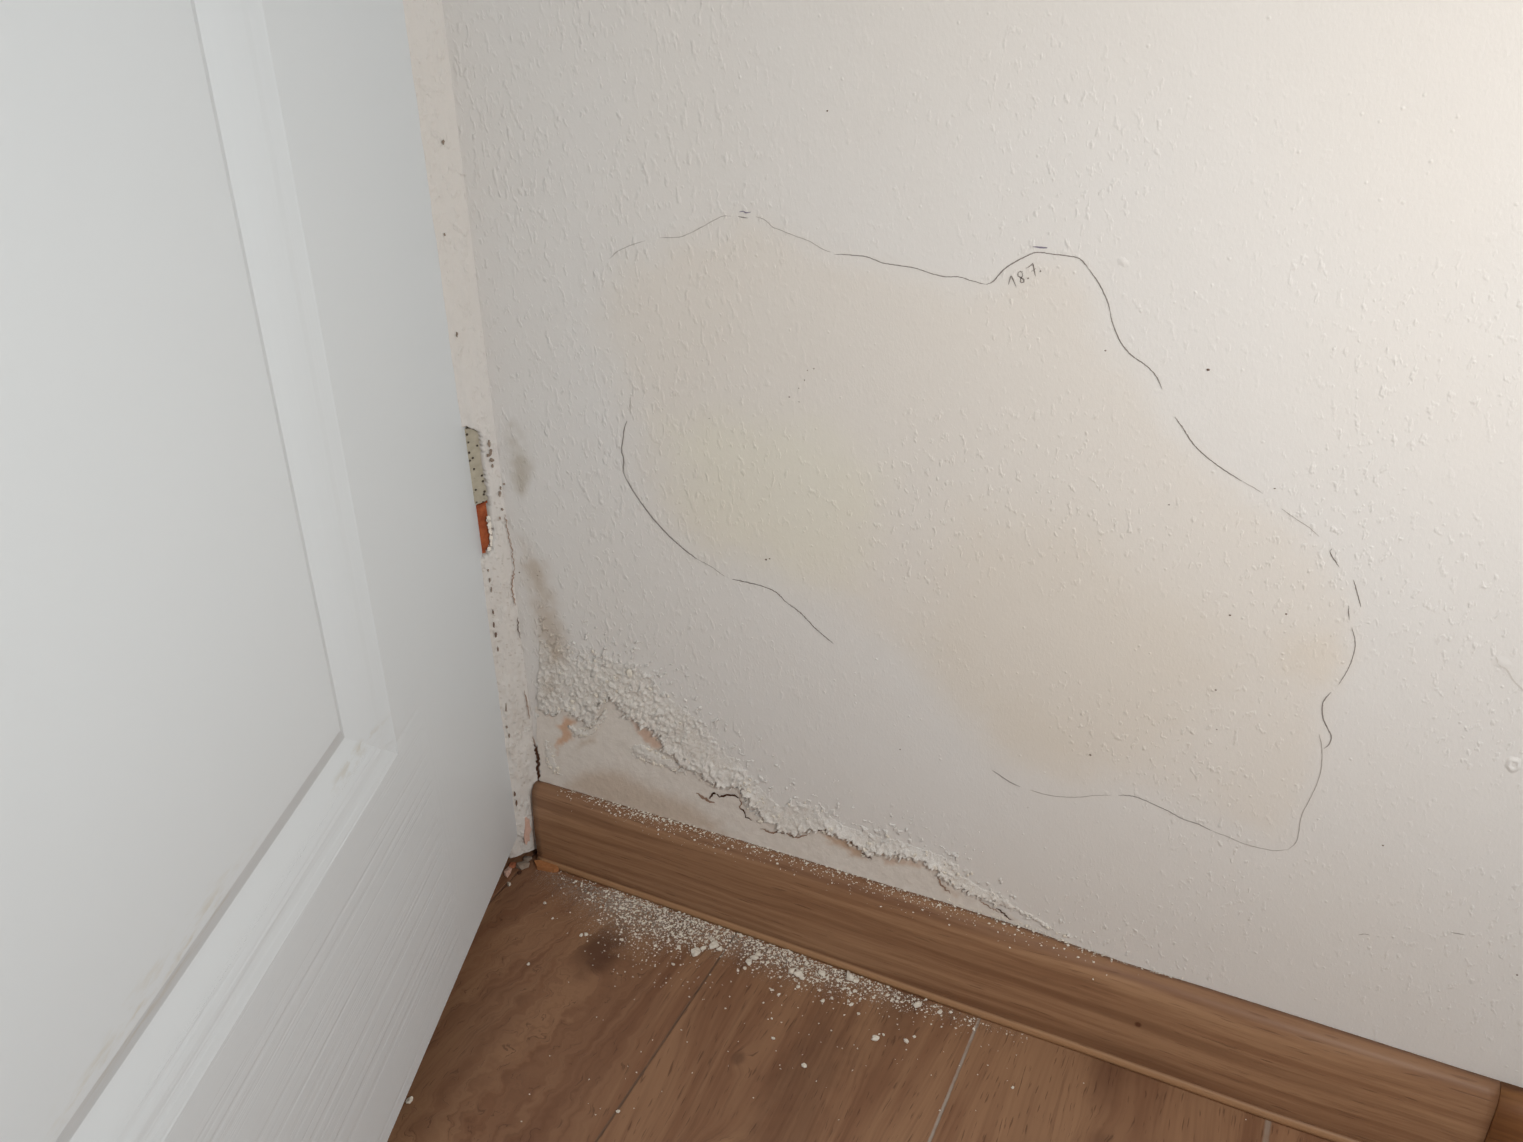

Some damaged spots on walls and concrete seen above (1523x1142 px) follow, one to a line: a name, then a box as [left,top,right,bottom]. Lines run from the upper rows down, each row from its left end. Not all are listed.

spalling [535,700,1030,926]
water stain [577,196,1371,852]